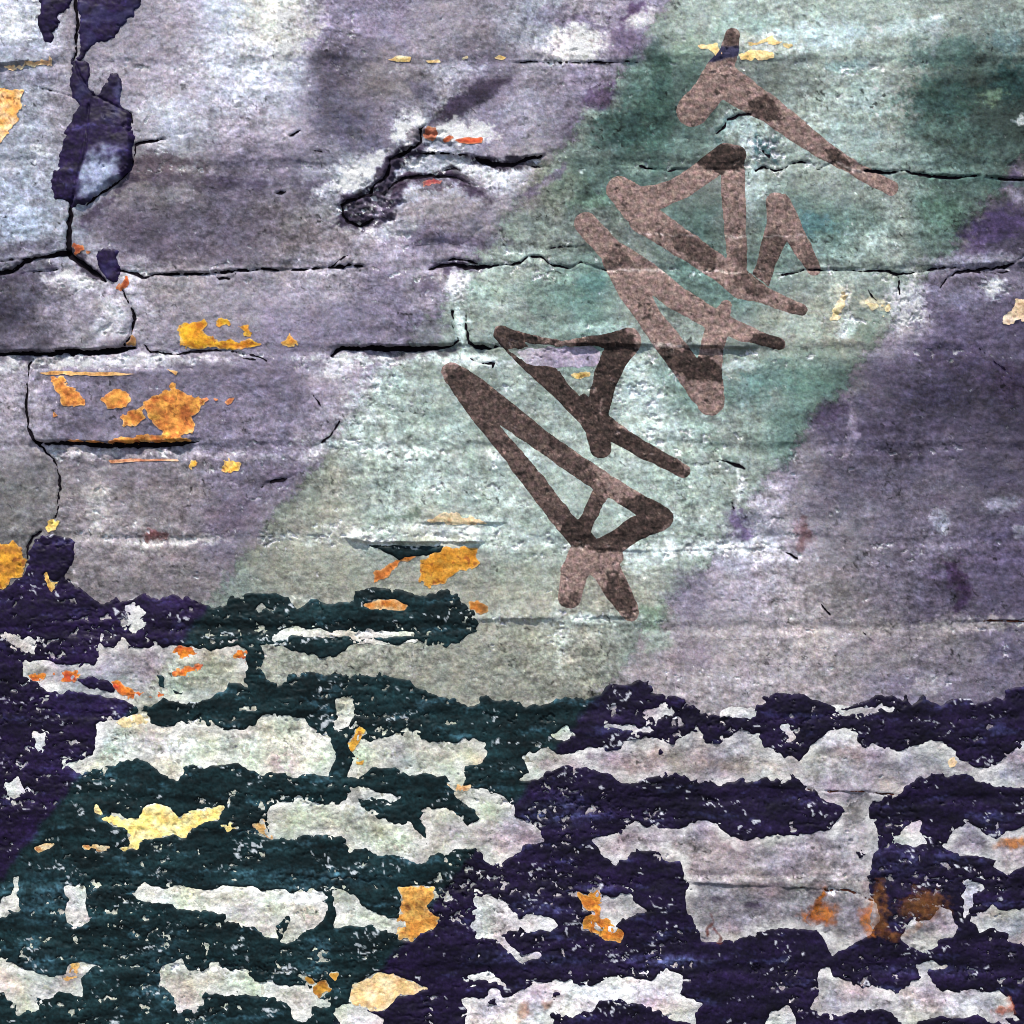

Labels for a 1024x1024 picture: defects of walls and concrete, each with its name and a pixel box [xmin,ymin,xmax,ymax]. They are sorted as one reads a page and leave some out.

crack [72,0,80,61]
peeling [38,0,141,208]
crack [716,113,752,134]
crack [340,126,543,227]
crack [755,140,822,172]
crack [864,169,1024,181]
peeling [72,243,129,291]
crack [428,246,607,271]
crack [781,258,1022,300]
crack [0,110,363,563]
crack [330,310,498,368]
peeling [0,519,1024,1024]